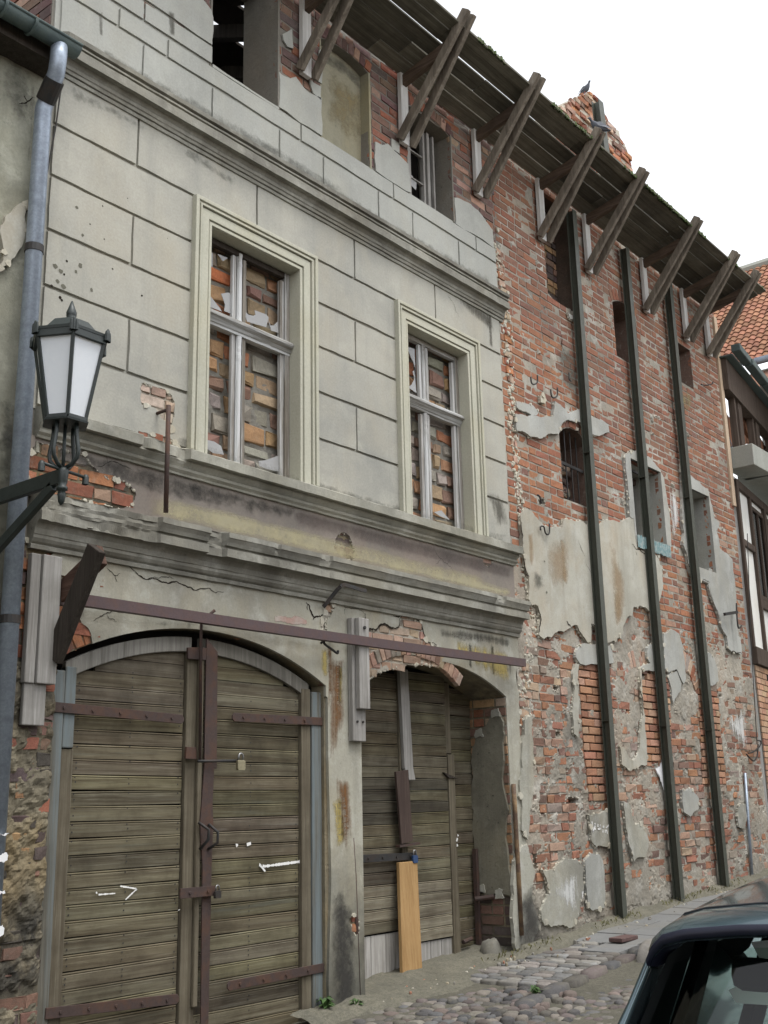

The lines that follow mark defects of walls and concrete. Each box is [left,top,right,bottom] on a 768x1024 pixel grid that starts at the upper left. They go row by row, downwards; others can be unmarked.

flaking render [0,200,28,272]
flaking render [494,228,510,294]
flaking render [138,383,181,448]
flaking render [29,441,135,509]
crack [107,566,221,593]
flaking render [67,621,100,654]
flaking render [369,616,463,687]
flaking render [471,310,742,950]
rust [328,649,342,739]
flaking render [0,543,57,1024]
rust [340,783,350,840]